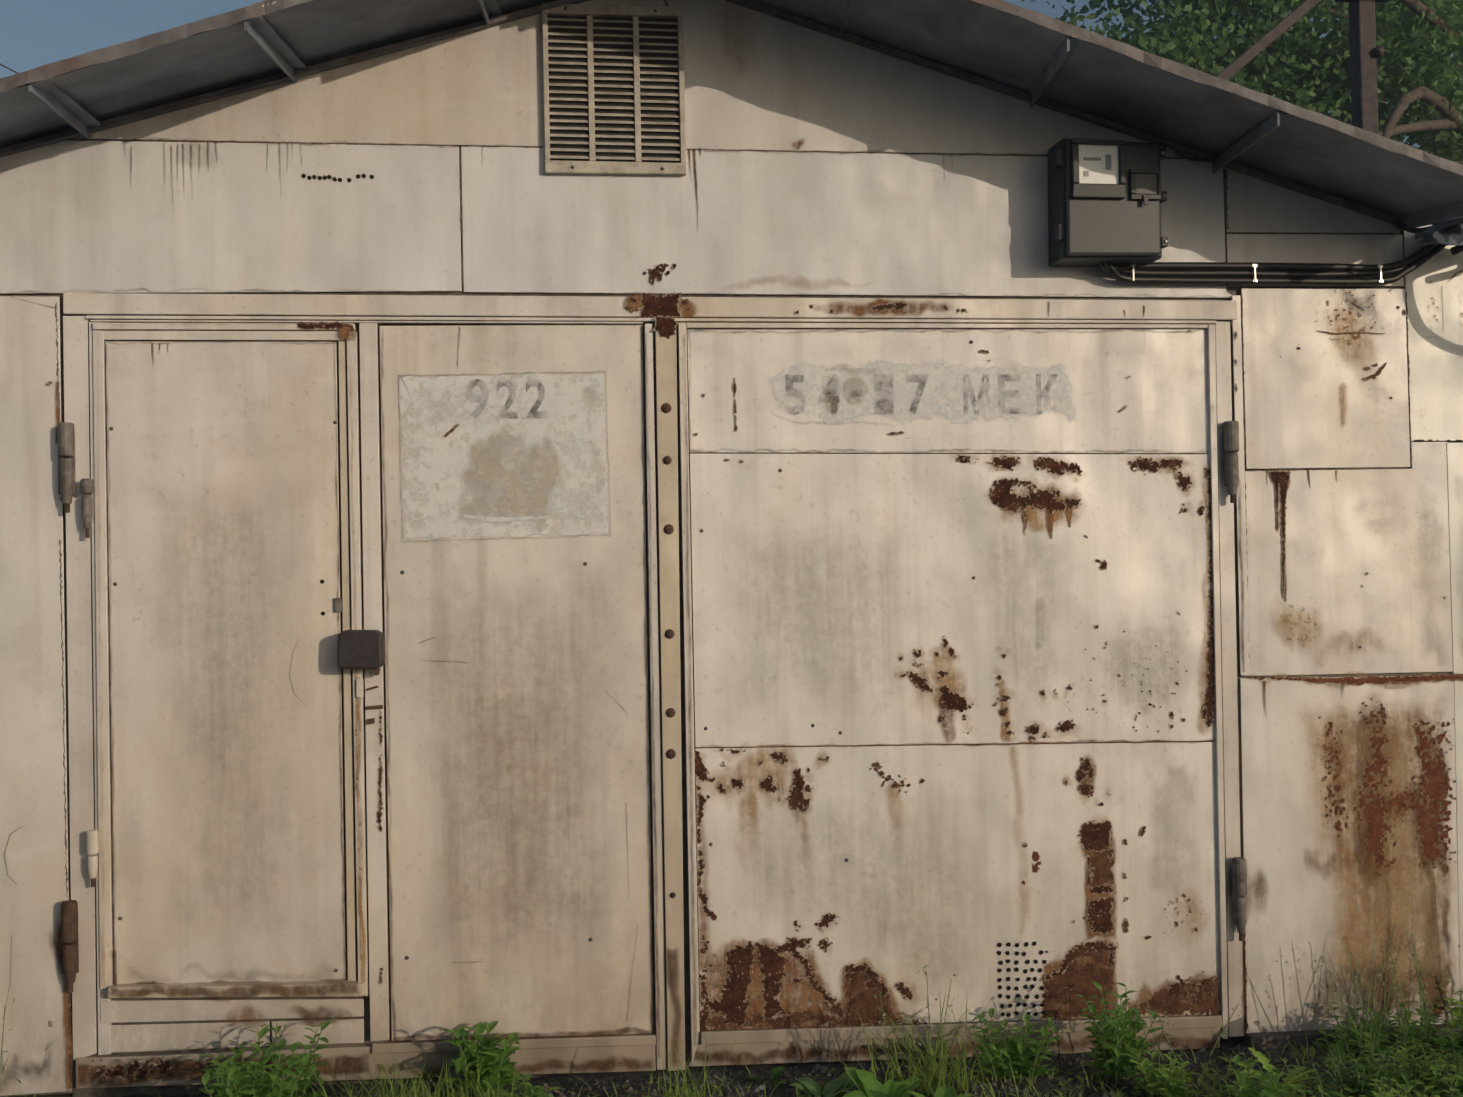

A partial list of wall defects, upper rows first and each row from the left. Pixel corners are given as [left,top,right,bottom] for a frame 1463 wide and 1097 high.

rust [625,263,695,339]
rust [1316,286,1385,349]
rust [1363,363,1387,381]
peeling [399,373,609,539]
rust [899,455,1221,1048]
rust [668,744,997,1064]
rust [1247,673,1463,1021]
rust [511,1059,650,1073]